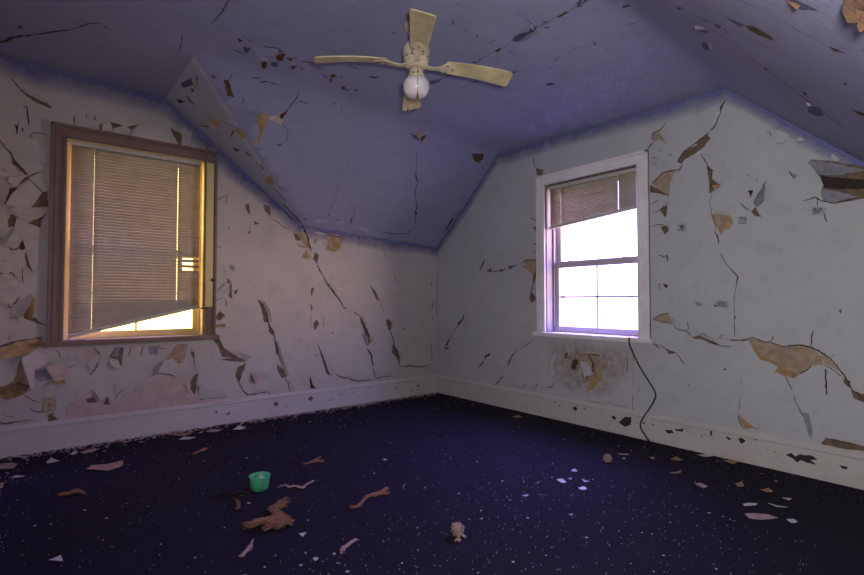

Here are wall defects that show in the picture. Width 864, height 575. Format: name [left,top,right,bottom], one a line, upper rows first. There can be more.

crack [0,23,111,43]
crack [429,0,597,88]
peeling [86,114,192,146]
crack [647,100,726,213]
peeling [0,140,49,273]
peeling [0,272,234,415]
crack [213,300,295,395]
crack [217,182,465,382]
crack [674,294,736,347]
peeling [717,331,864,402]
peeling [787,453,817,465]
flaking render [821,438,864,451]